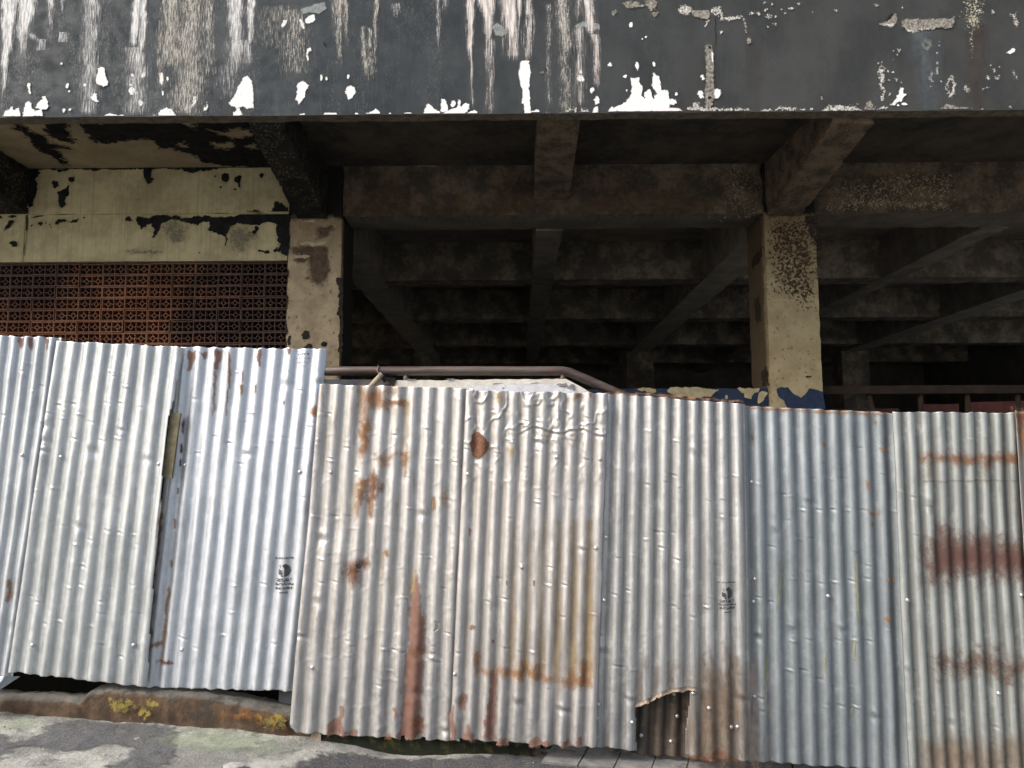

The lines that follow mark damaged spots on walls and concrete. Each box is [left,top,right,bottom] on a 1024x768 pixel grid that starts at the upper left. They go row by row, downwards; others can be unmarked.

peeling [424,99,477,113]
damp [467,0,534,107]
peeling [519,60,550,113]
damp [546,0,599,108]
peeling [561,45,907,113]
peeling [4,67,270,228]
peeling [125,201,327,259]
damp [292,225,333,284]
rust [187,349,256,415]
rust [470,432,489,459]
rust [387,575,426,740]
rust [449,604,591,746]